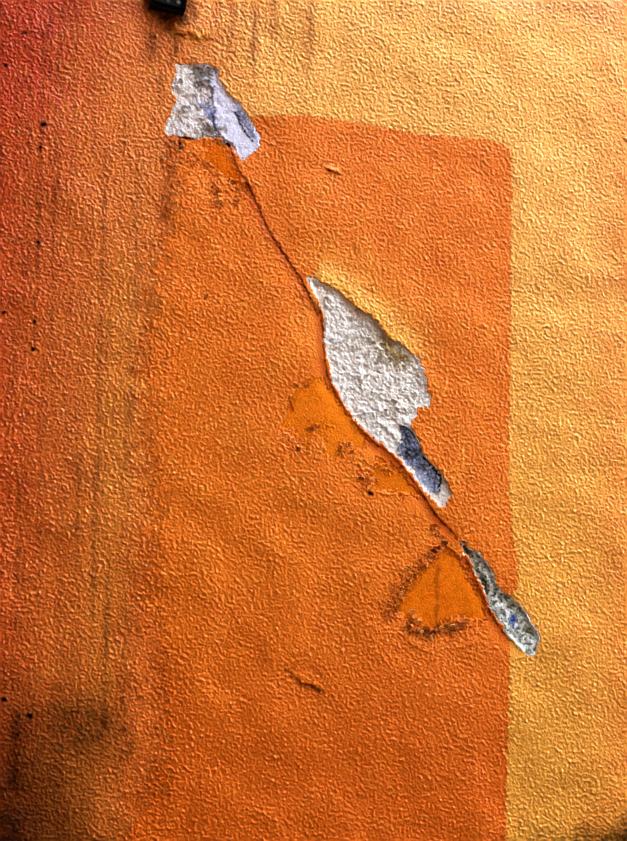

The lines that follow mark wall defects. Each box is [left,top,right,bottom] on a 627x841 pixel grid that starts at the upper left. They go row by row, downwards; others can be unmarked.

flaking render [165,63,261,206]
crack [222,140,334,388]
flaking render [277,277,452,508]
peeling [384,541,540,657]